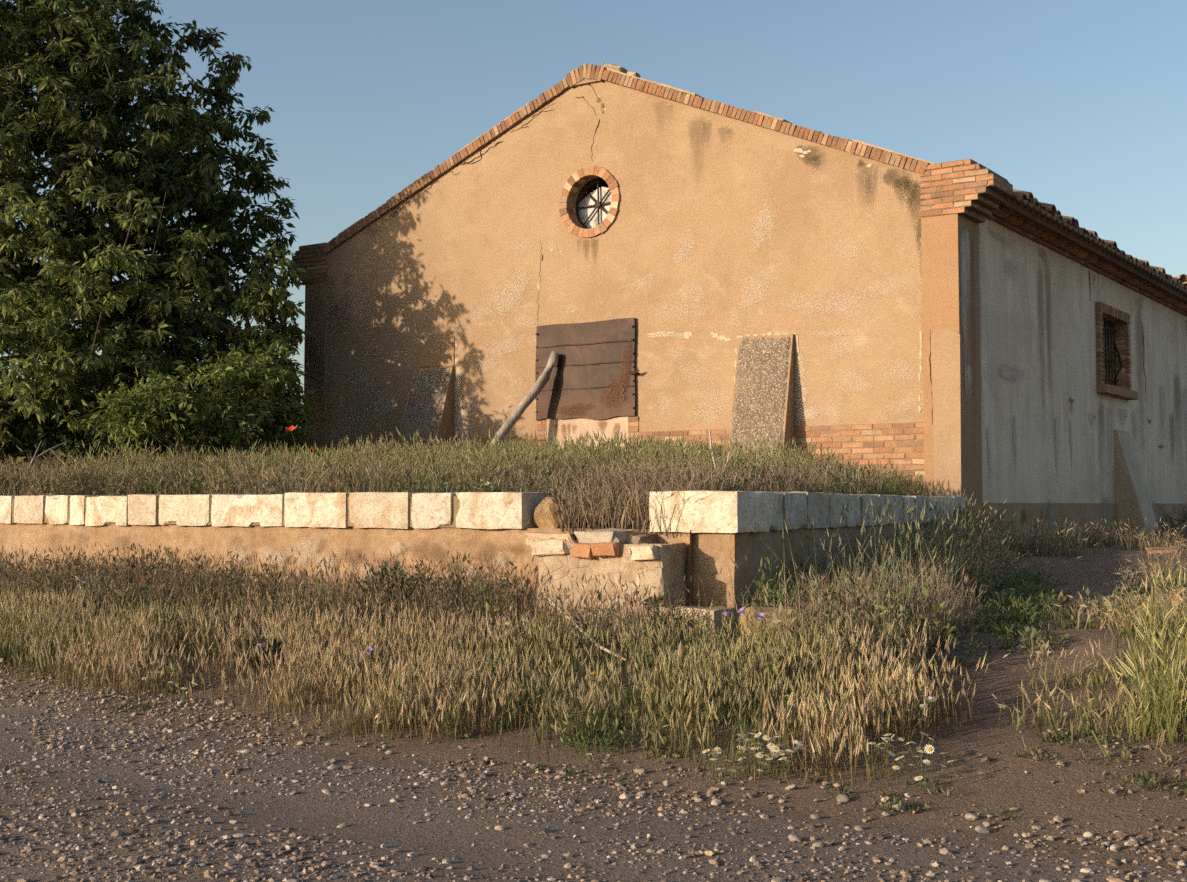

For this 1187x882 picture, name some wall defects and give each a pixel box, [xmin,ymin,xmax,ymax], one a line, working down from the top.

crack [386,84,600,220]